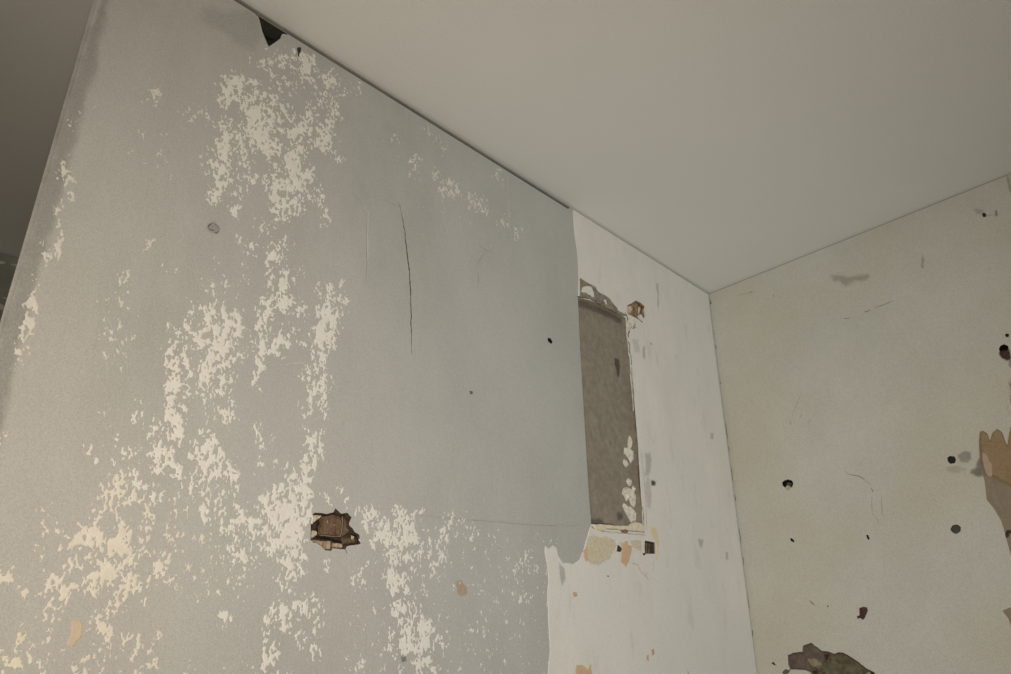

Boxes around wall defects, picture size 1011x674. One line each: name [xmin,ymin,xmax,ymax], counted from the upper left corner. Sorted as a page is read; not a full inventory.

flaking render [0,13,757,674]
crack [387,201,412,354]
peeling [979,429,1011,554]
spalling [772,643,875,674]